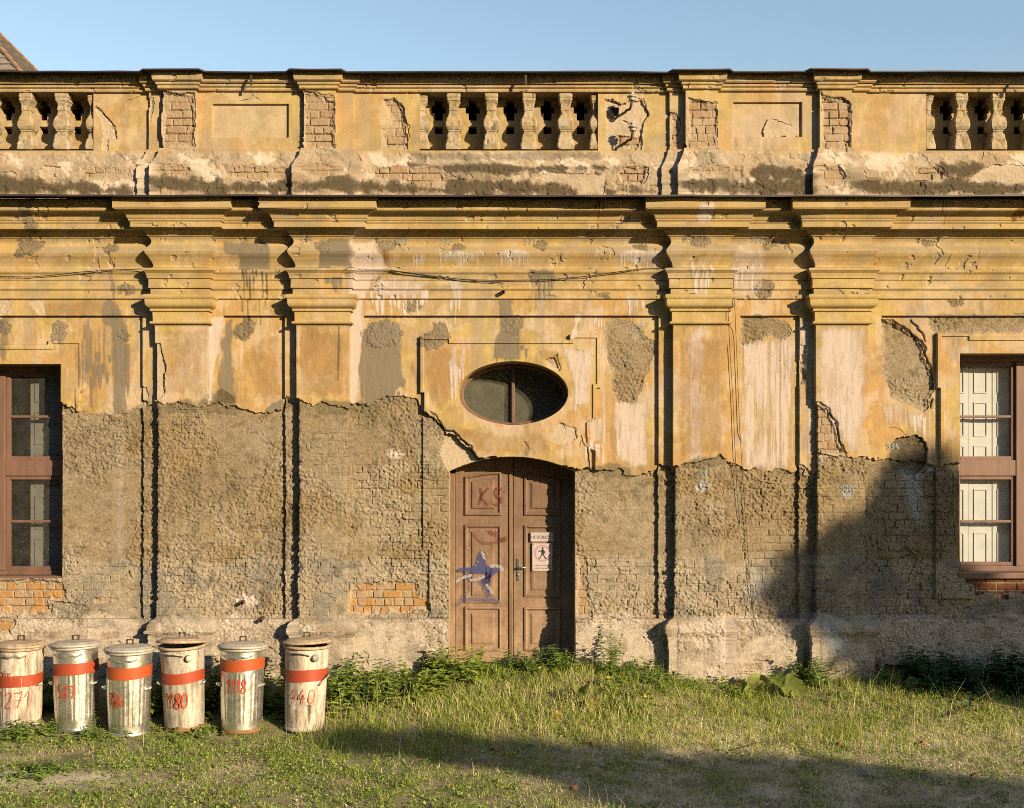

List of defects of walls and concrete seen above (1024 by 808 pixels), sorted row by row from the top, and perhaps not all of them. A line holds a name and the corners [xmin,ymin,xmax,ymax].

spalling [149,90,196,178]
spalling [302,92,335,179]
spalling [382,98,408,150]
spalling [670,98,729,177]
spalling [820,93,852,153]
water stain [80,269,130,415]
spalling [605,318,655,404]
spalling [740,315,791,346]
spalling [881,319,935,412]
spalling [0,344,495,685]
spalling [564,402,1024,685]